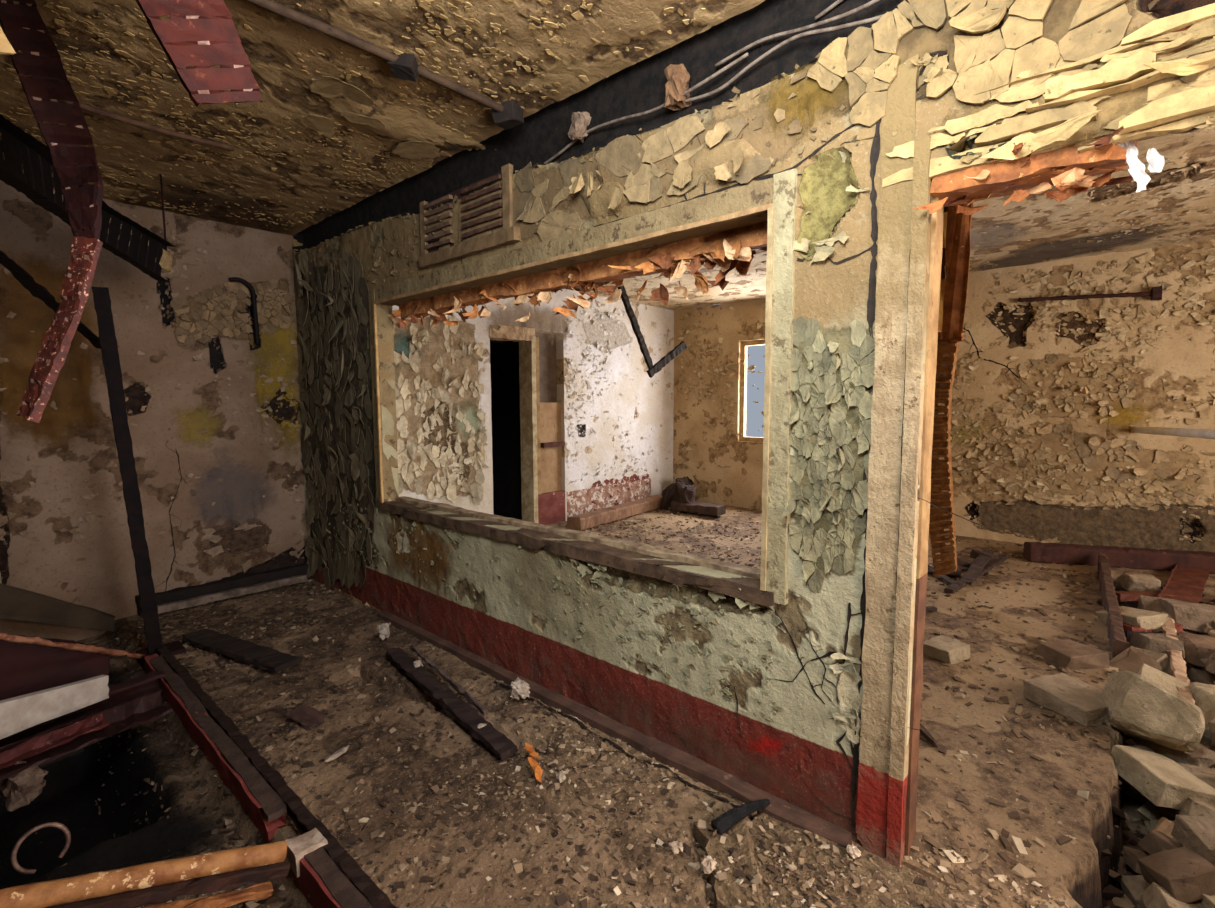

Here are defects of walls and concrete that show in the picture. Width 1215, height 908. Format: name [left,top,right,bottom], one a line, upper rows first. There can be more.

corrosion [387,239,767,329]
flaking render [157,0,1215,592]
crack [594,119,882,357]
crack [767,385,873,828]
crack [917,497,982,526]